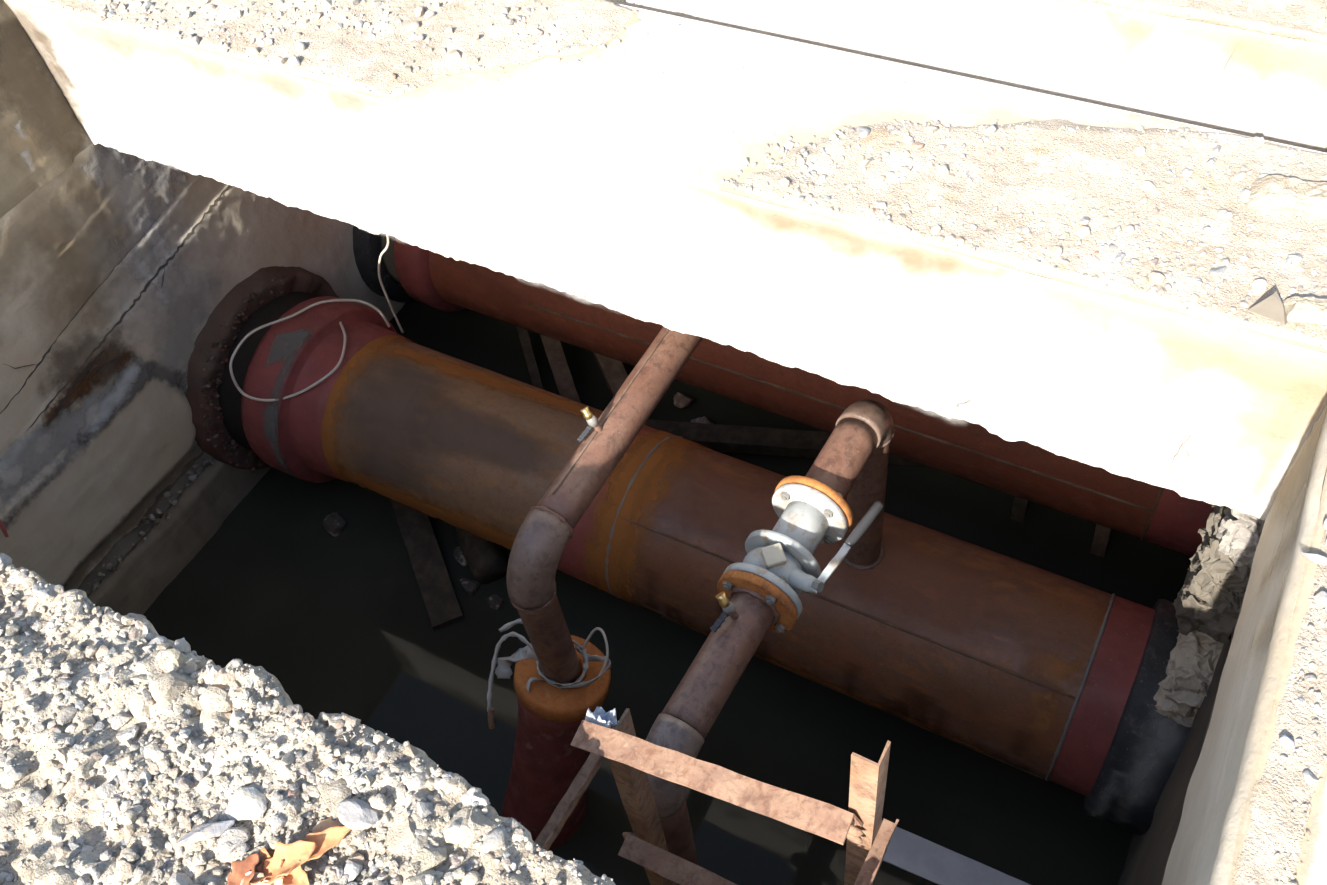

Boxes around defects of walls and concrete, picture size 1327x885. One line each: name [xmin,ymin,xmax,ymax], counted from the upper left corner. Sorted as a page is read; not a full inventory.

leakage [717,196,995,274]
corrosion [42,349,132,429]
leakage [431,222,1086,448]
leakage [1038,288,1327,558]
spalling [1172,504,1265,643]